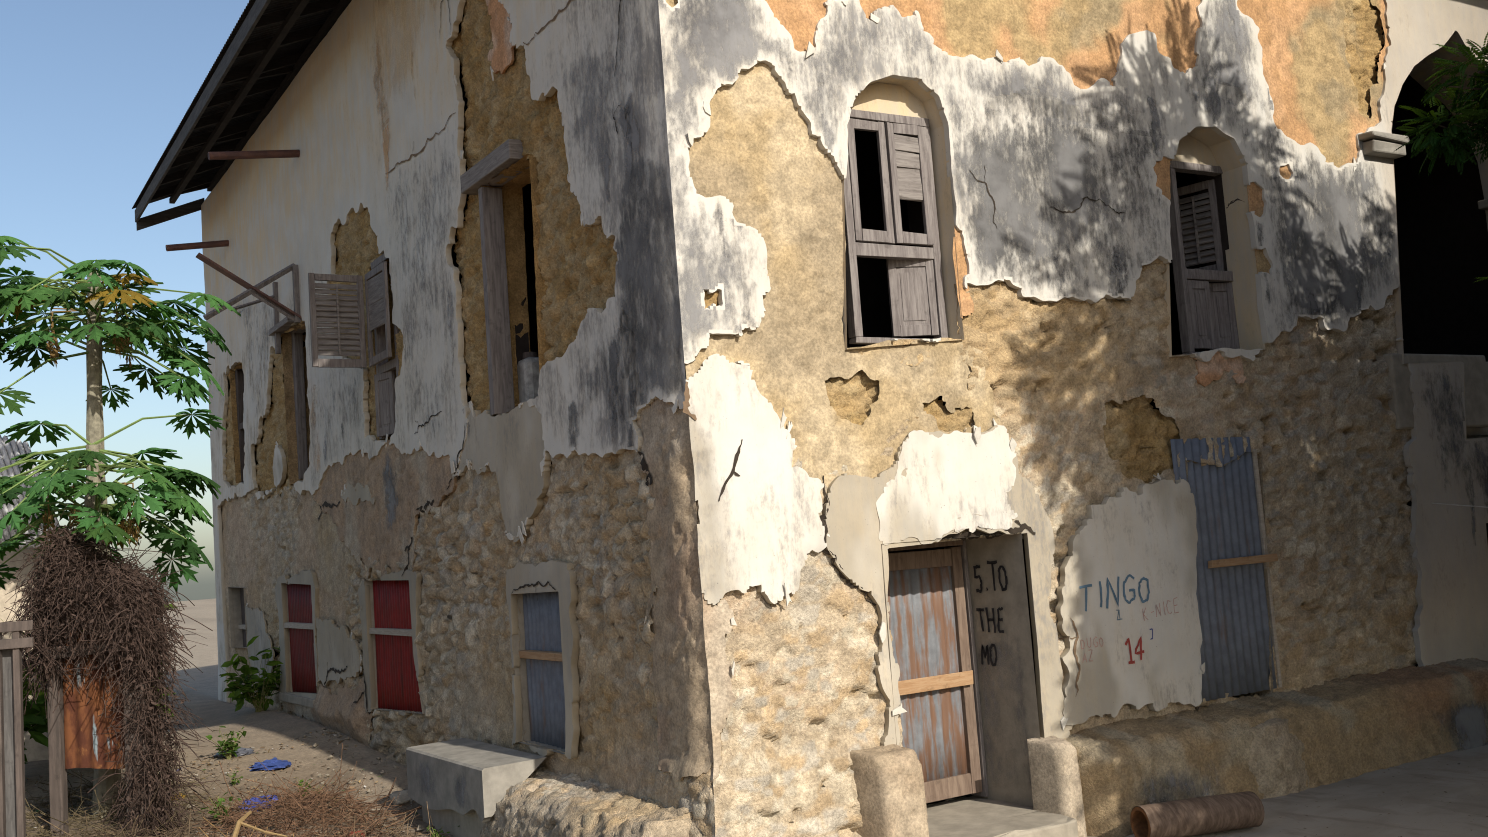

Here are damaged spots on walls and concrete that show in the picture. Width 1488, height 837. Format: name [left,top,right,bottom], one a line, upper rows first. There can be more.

crack [386,112,456,174]
spalling [451,0,618,361]
crack [523,0,570,45]
leakage [569,50,742,448]
leakage [659,0,790,150]
peeling [765,0,1201,89]
leakage [954,67,1160,296]
peeling [1237,0,1389,172]
leakage [1257,135,1393,322]
crack [683,381,697,420]
crack [718,439,743,501]
spalling [672,63,1205,746]